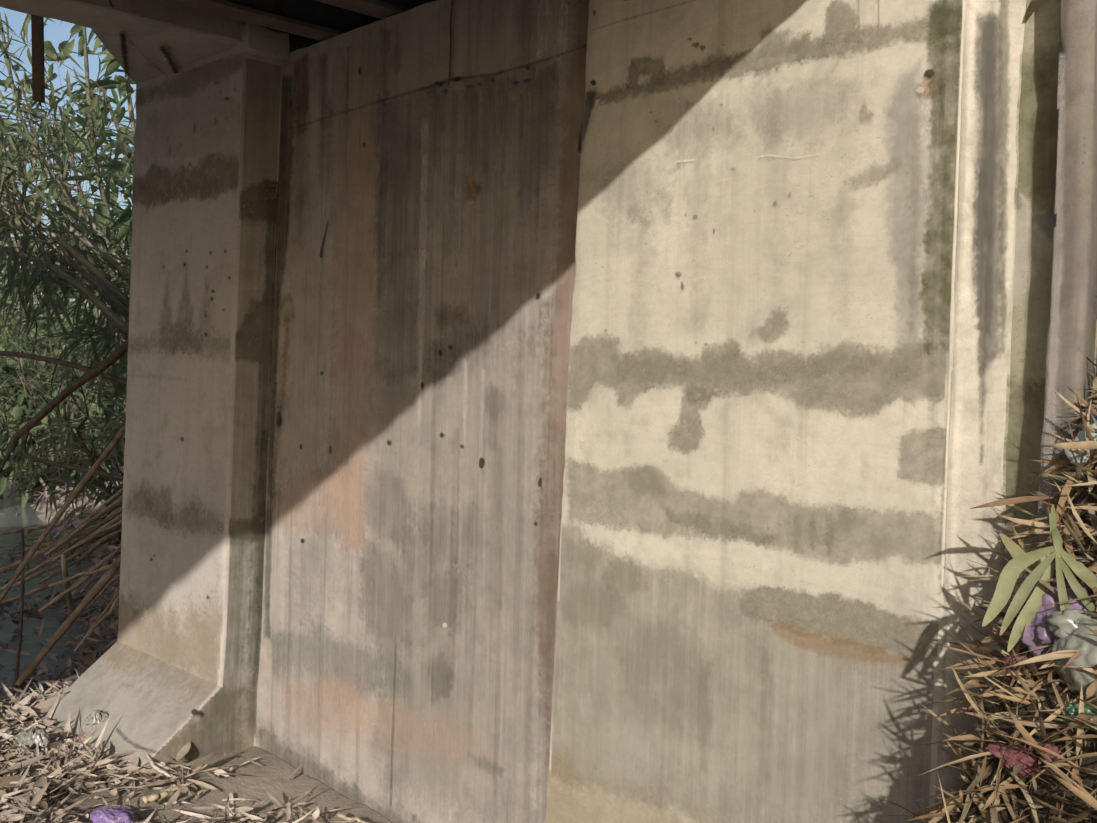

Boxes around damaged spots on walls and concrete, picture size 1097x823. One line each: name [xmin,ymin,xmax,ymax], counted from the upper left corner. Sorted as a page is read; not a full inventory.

damp [589,1,963,107]
damp [974,0,1008,367]
damp [132,57,352,800]
damp [568,338,946,452]
damp [552,531,938,823]